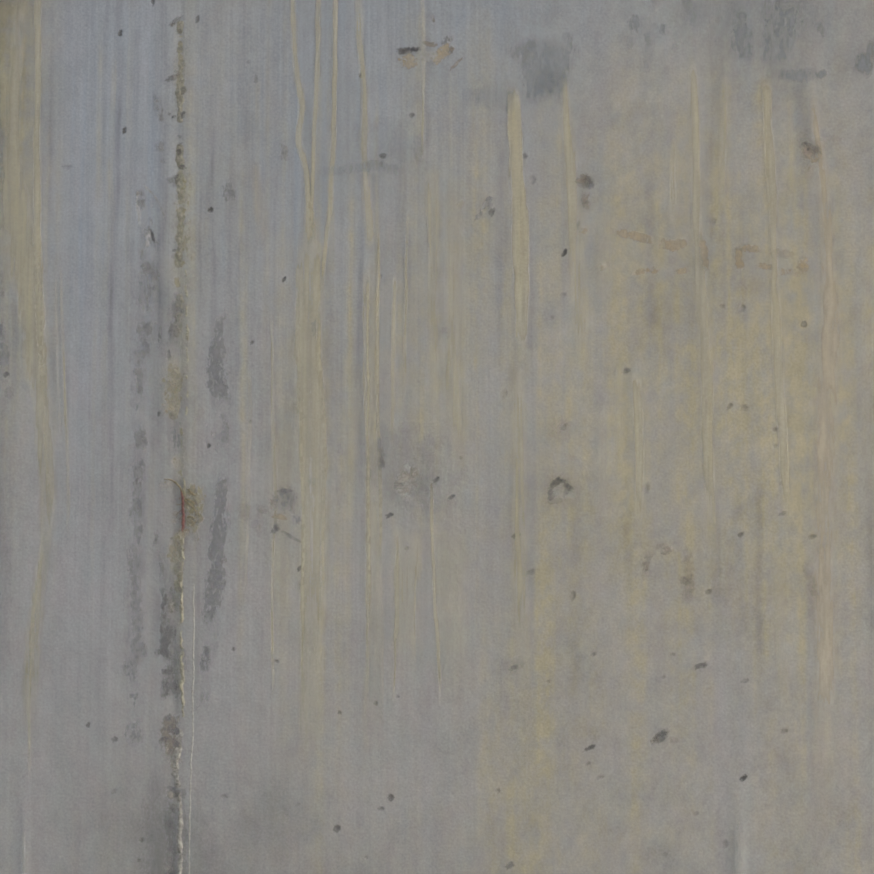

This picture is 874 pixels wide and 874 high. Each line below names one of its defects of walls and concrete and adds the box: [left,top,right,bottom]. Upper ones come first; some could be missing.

spalling [398,36,462,71]
damp [3,59,52,492]
damp [508,92,529,331]
damp [206,318,229,399]
damp [203,480,228,618]